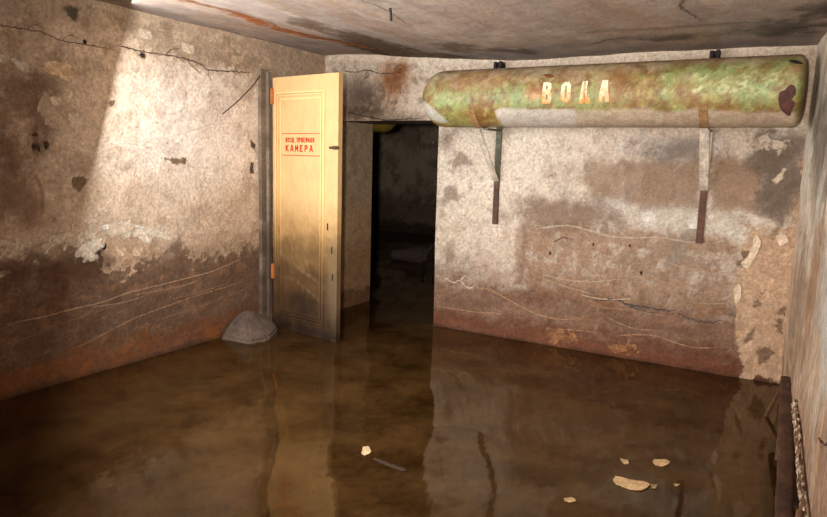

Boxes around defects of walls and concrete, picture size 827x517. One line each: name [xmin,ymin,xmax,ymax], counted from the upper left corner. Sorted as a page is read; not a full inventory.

crack [0,24,251,80]
rust [219,8,373,49]
rust [778,85,796,116]
leakage [0,209,172,283]
leakage [24,219,254,321]
flaking render [731,199,799,382]
rust [545,328,579,344]
rust [608,339,640,356]